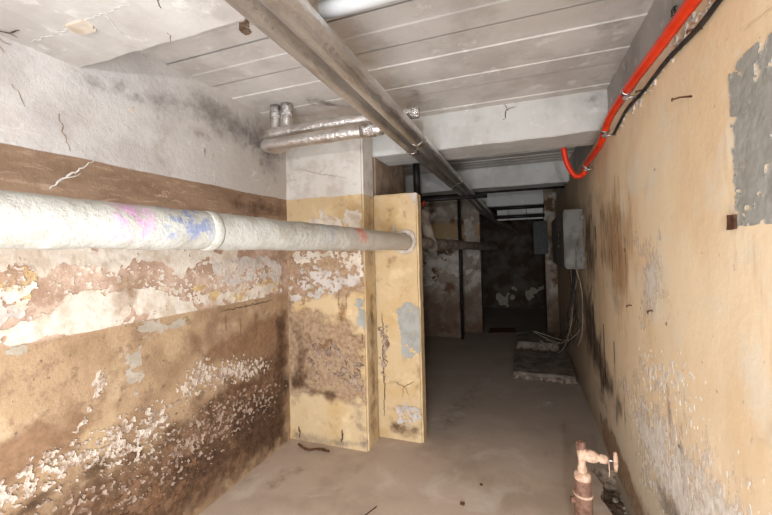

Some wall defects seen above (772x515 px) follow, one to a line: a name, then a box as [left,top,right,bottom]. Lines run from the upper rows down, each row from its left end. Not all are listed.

crack [49,161,94,189]
peeling [308,208,362,228]
flaking render [728,32,772,227]
peeling [0,248,365,396]
water stain [0,250,374,515]
flaking render [378,325,390,382]
peeling [396,302,420,359]
peeling [395,402,422,427]
peeling [496,286,544,307]
water stain [582,287,649,393]
water stain [600,415,643,515]
water stain [632,393,743,515]